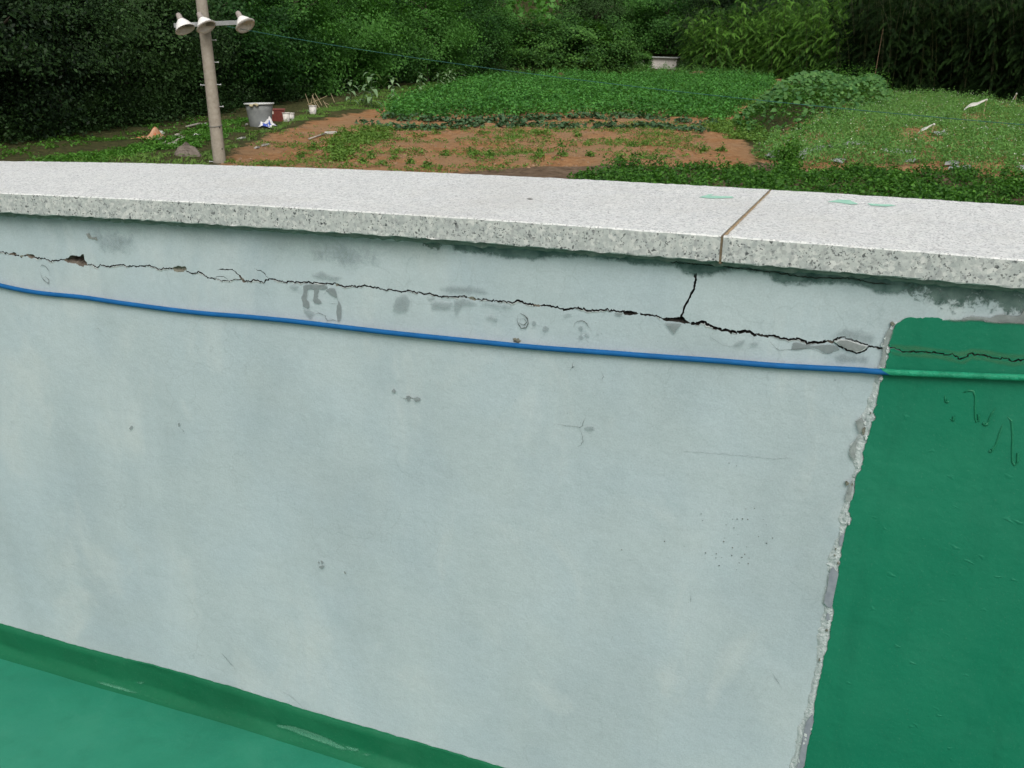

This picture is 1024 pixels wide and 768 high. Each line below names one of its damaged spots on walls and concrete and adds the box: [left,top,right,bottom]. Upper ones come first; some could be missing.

crack [0,251,65,264]
spalling [64,254,87,267]
crack [89,261,1024,362]
peeling [789,321,900,768]